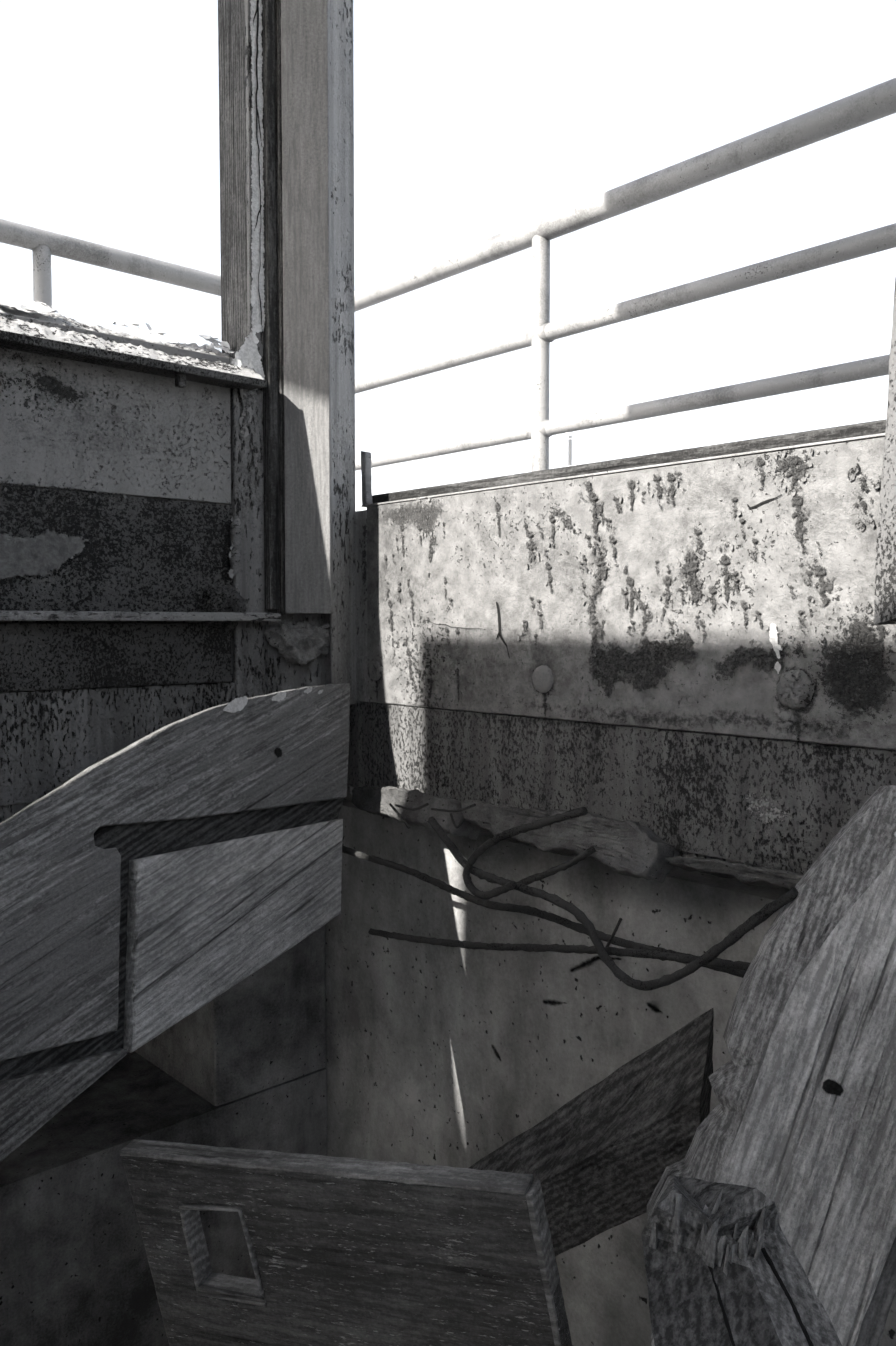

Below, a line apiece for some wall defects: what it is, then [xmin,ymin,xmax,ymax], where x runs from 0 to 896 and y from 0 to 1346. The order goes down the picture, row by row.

peeling [0,294,68,314]
peeling [104,317,166,337]
peeling [0,529,89,579]
corrosion [380,497,447,698]
corrosion [708,543,769,632]
corrosion [755,447,834,607]
corrosion [845,457,881,538]
spalling [264,619,350,667]
corrosion [603,597,896,749]